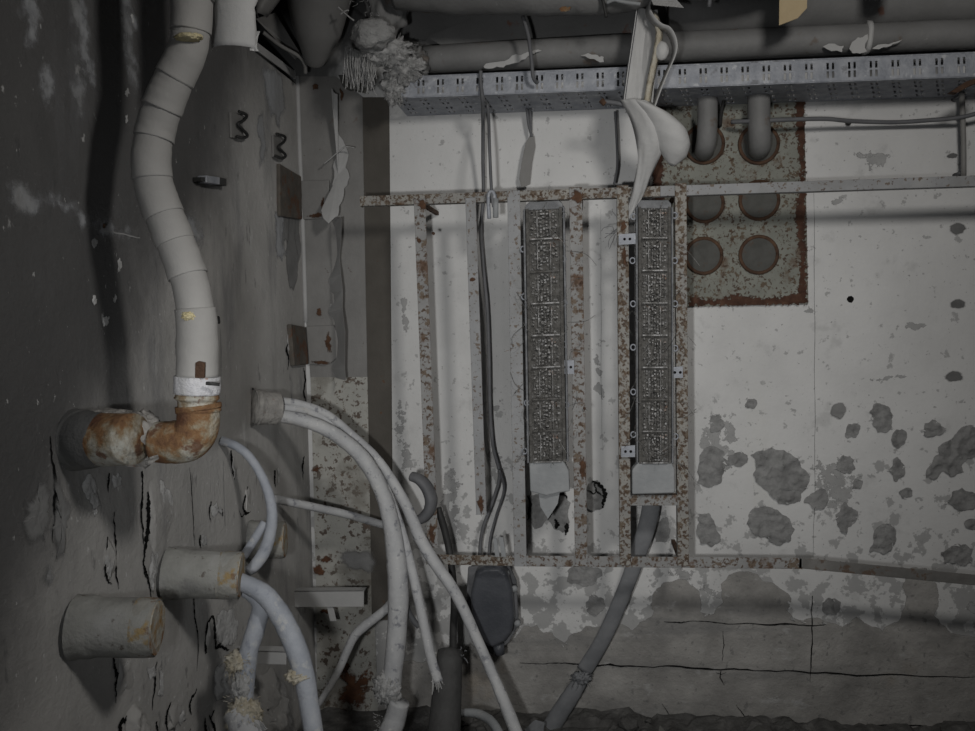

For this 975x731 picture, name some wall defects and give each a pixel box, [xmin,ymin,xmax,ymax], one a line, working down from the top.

corrosion [651,154,664,186]
corrosion [794,99,807,181]
corrosion [688,193,808,307]
spalling [831,403,912,499]
spalling [921,420,975,480]
crack [107,451,251,592]
spalling [696,445,858,547]
crack [113,658,216,731]
crack [193,599,239,666]
corrosion [339,663,373,711]
peeling [461,567,975,728]
crack [527,596,953,684]